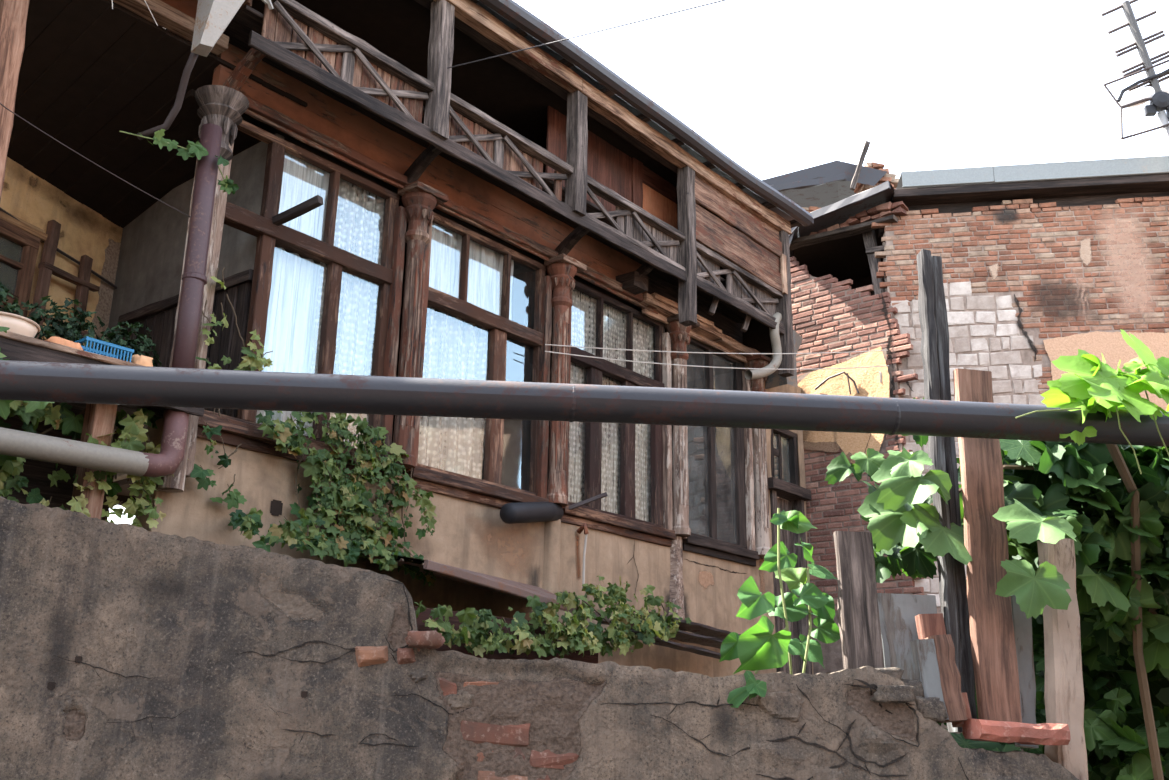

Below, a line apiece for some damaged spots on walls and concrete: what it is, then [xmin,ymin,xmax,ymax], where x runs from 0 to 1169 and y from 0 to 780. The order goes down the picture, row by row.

crack [240,641,356,664]
crack [385,579,413,662]
crack [391,684,471,715]
spalling [355,595,606,780]
crack [604,679,920,780]